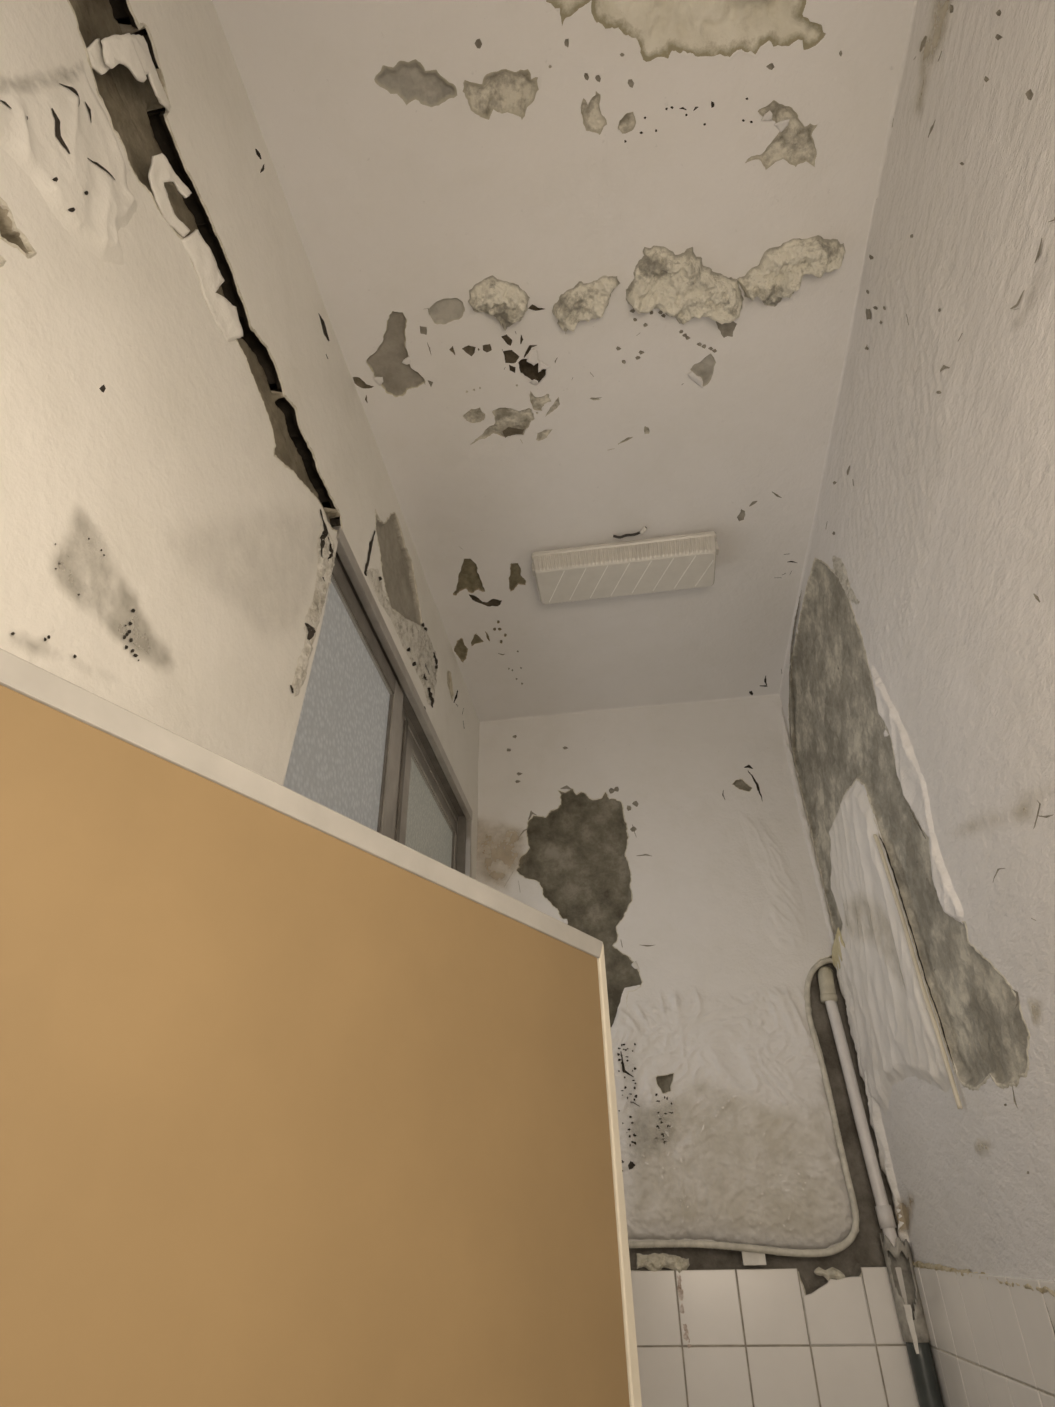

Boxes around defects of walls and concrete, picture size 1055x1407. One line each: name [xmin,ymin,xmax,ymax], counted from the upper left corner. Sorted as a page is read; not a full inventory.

flaking render [519,0,829,70]
flaking render [373,58,552,121]
flaking render [742,97,819,171]
flaking render [0,197,37,267]
crack [0,0,375,581]
flaking render [365,297,466,398]
peeling [616,309,666,364]
flaking render [449,331,560,446]
leakage [115,596,151,661]
crack [305,623,316,640]
flaking render [505,785,654,1028]
leakage [617,1043,640,1172]